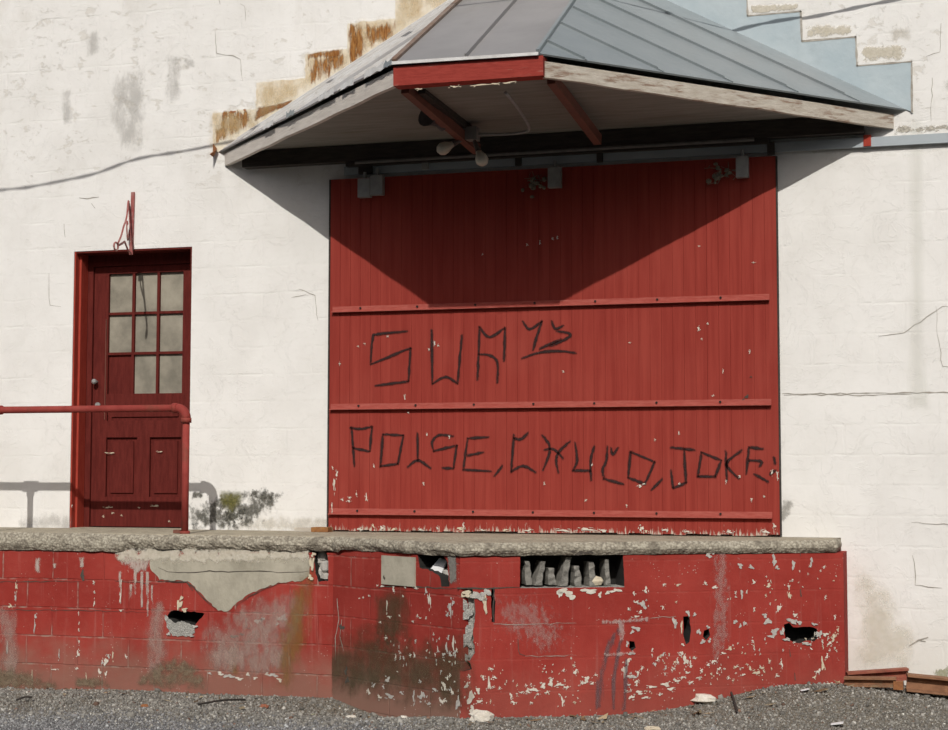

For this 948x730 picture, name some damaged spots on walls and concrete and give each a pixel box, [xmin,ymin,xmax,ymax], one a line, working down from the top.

corrosion [308,23,391,82]
corrosion [216,100,292,142]
crack [883,306,948,367]
crack [782,390,948,398]
water stain [191,491,278,529]
peeling [443,556,456,583]
peeling [74,611,128,680]
spalling [165,596,198,637]
water stain [332,597,461,698]
spalling [367,585,598,716]
spalling [520,550,839,700]